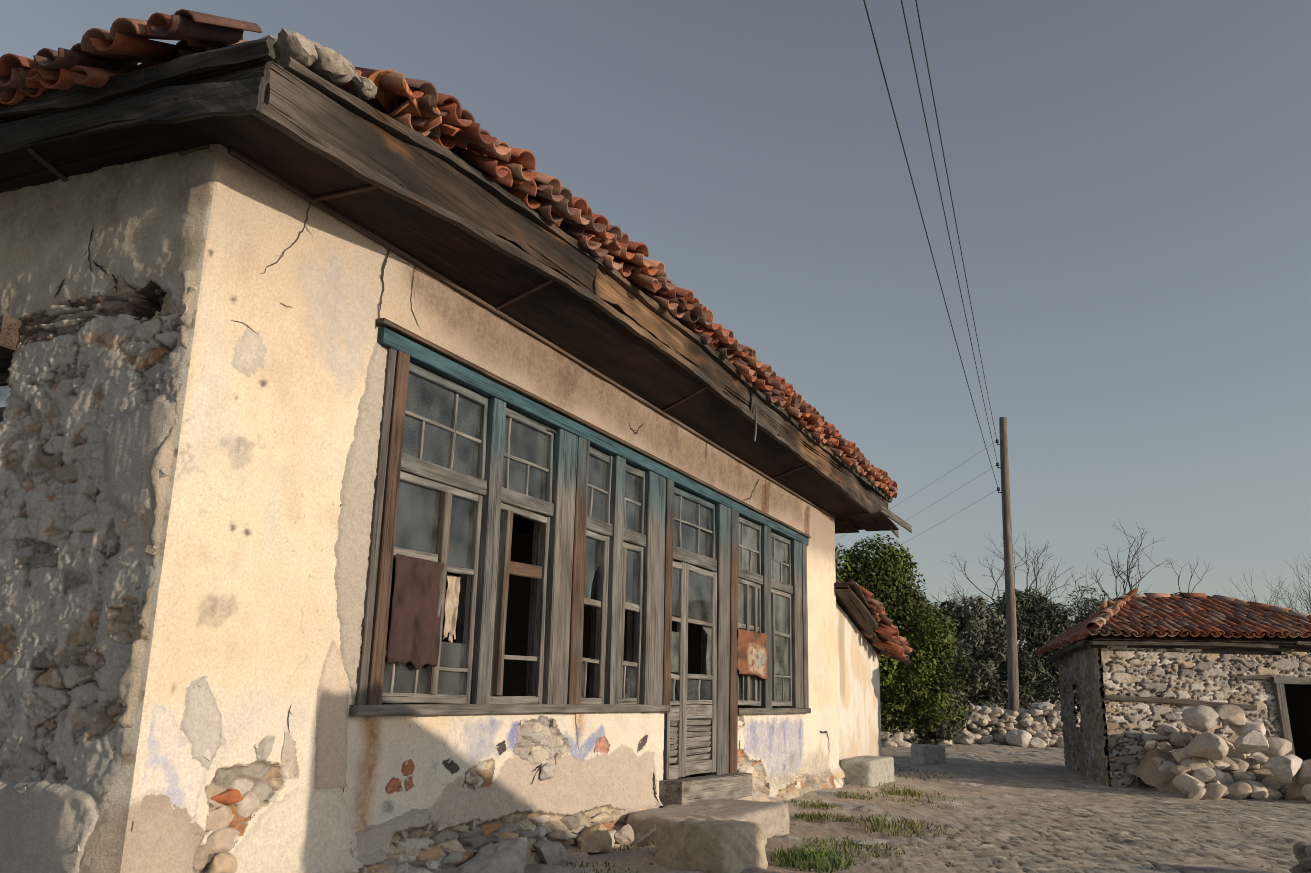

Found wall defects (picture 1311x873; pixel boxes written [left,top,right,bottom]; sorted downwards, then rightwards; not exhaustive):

crack [54,223,117,298]
crack [260,203,311,274]
spalling [17,269,197,350]
spalling [8,537,60,569]
spalling [0,624,23,664]
spalling [70,648,106,677]
flaking render [83,382,299,873]
spalling [385,759,415,794]
spalling [443,715,571,790]
spalling [594,736,610,754]
flaking render [0,779,98,873]